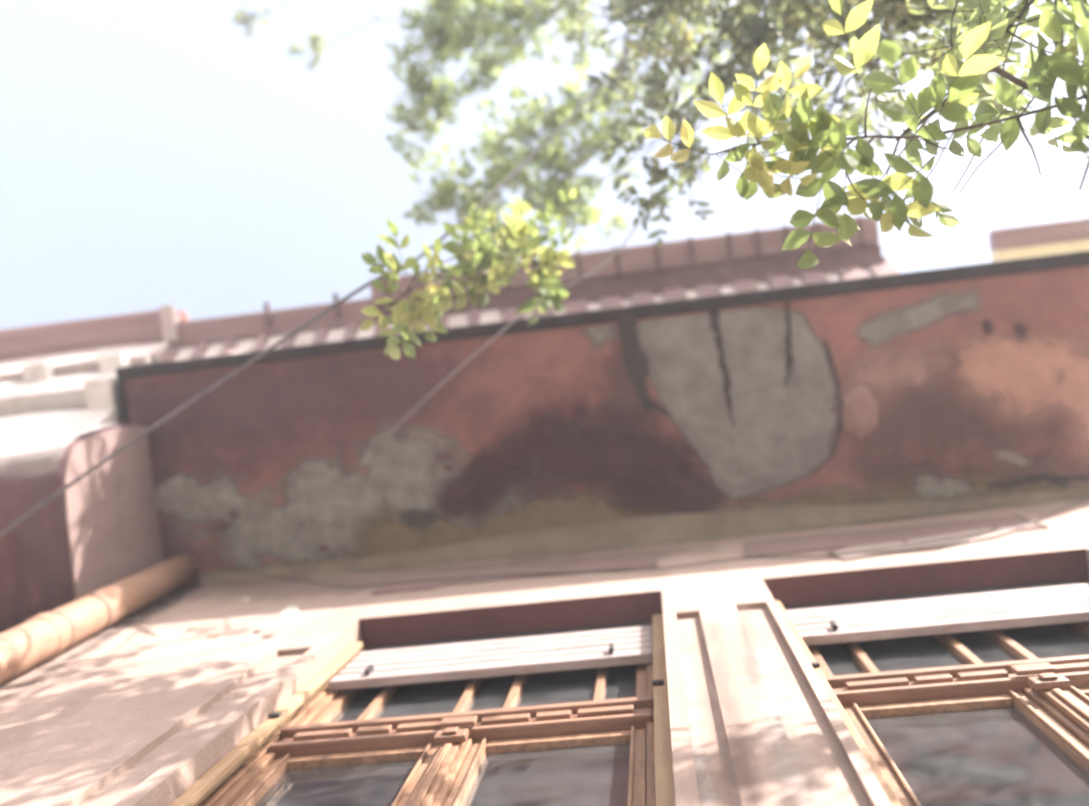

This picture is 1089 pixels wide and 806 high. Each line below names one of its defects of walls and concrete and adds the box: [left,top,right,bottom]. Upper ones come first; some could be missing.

spalling [154,427,669,570]
water stain [438,343,721,514]
crack [708,308,734,428]
spalling [636,288,1089,510]